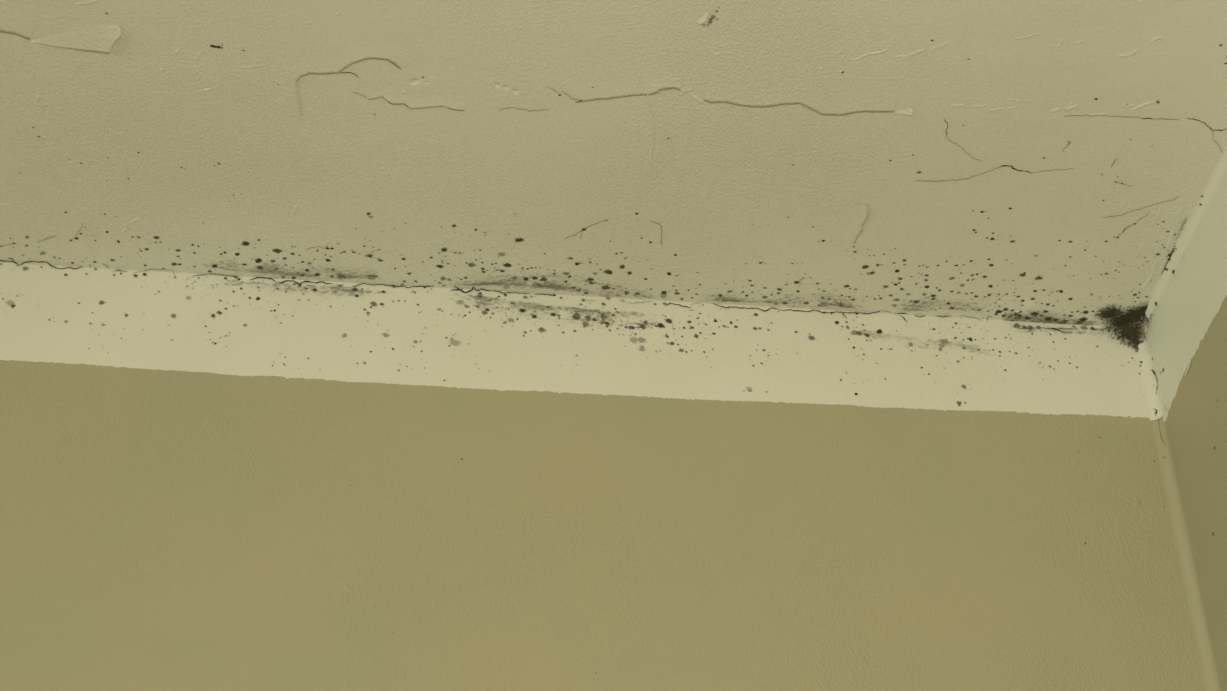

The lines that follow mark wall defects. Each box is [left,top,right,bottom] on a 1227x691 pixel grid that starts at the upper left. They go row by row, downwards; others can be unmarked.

crack [918,119,1067,182]
crack [1064,115,1226,151]
damp [70,231,426,314]
crack [0,226,556,297]
damp [430,241,737,353]
crack [587,296,1063,336]
damp [719,246,1164,374]